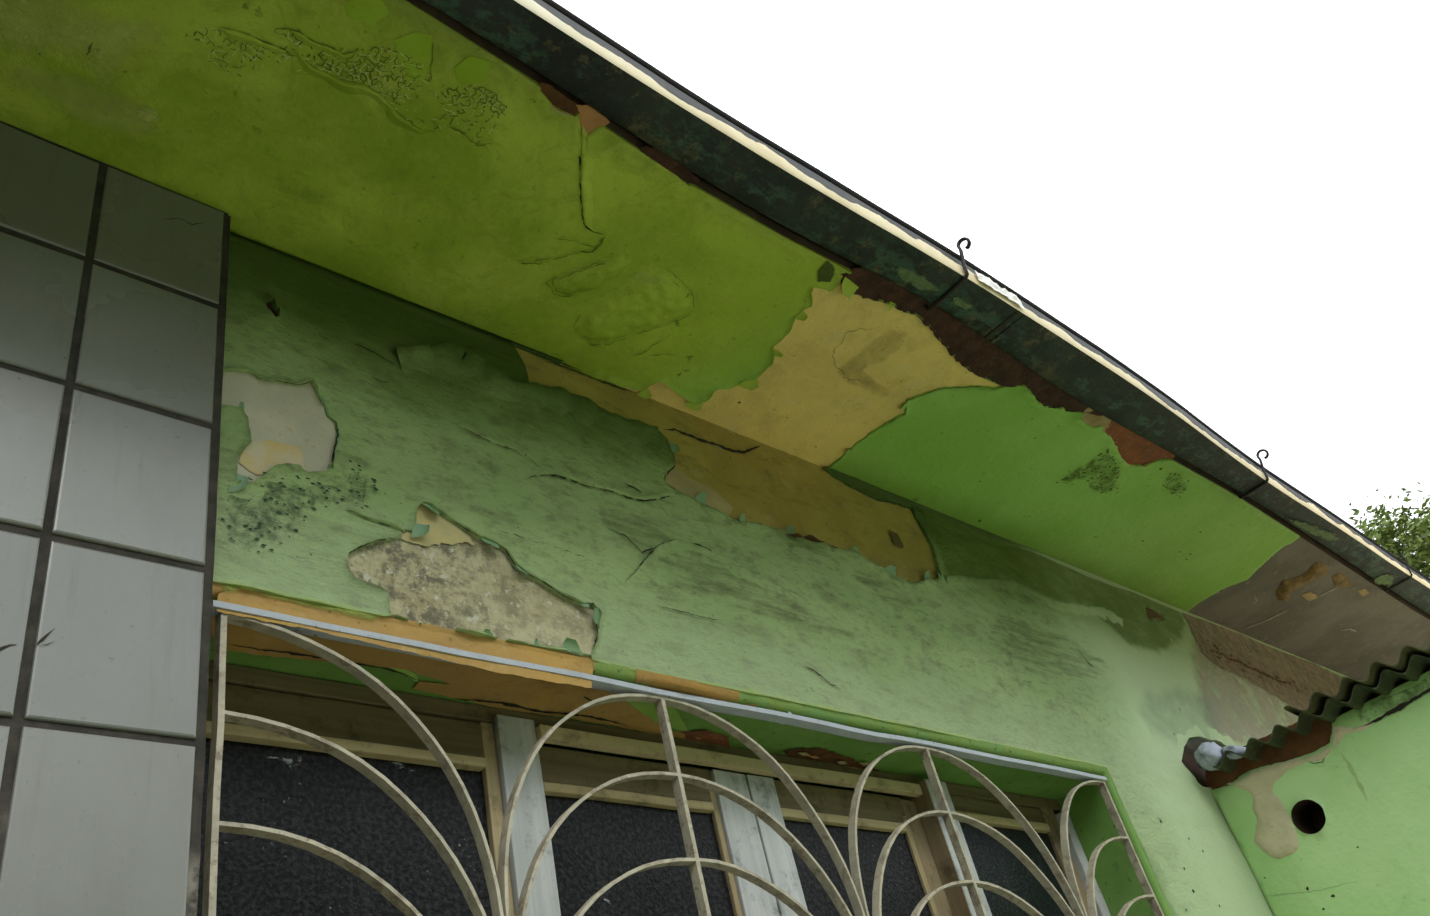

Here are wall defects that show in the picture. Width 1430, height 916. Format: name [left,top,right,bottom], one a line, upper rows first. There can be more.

crack [521,125,695,356]
peeling [222,371,341,492]
damp [221,460,385,553]
peeling [391,261,1175,628]
peeling [211,503,730,747]
peeling [634,669,758,713]
flaking render [1181,537,1430,789]